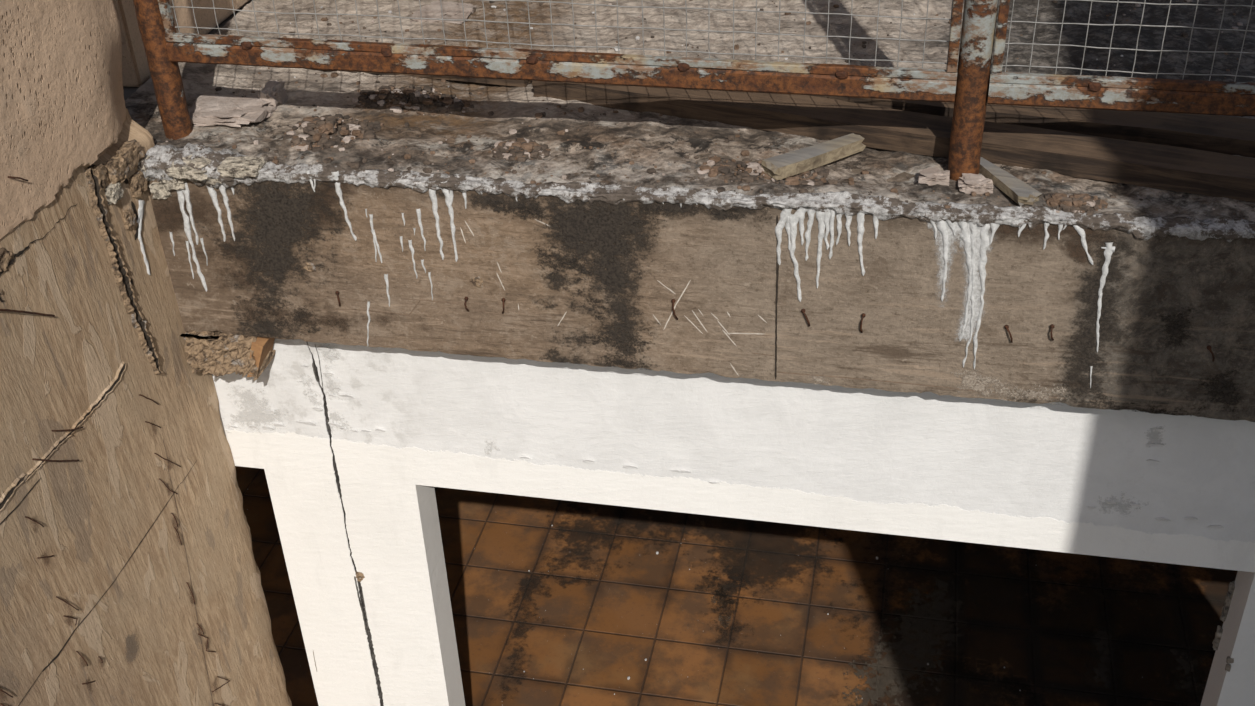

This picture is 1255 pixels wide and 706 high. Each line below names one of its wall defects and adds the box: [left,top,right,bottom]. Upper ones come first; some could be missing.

crack [0,163,163,525]
spalling [92,139,150,229]
spalling [180,331,276,380]
damp [137,143,1255,416]
crack [18,440,214,706]
crack [307,342,384,706]
damp [842,576,1041,706]